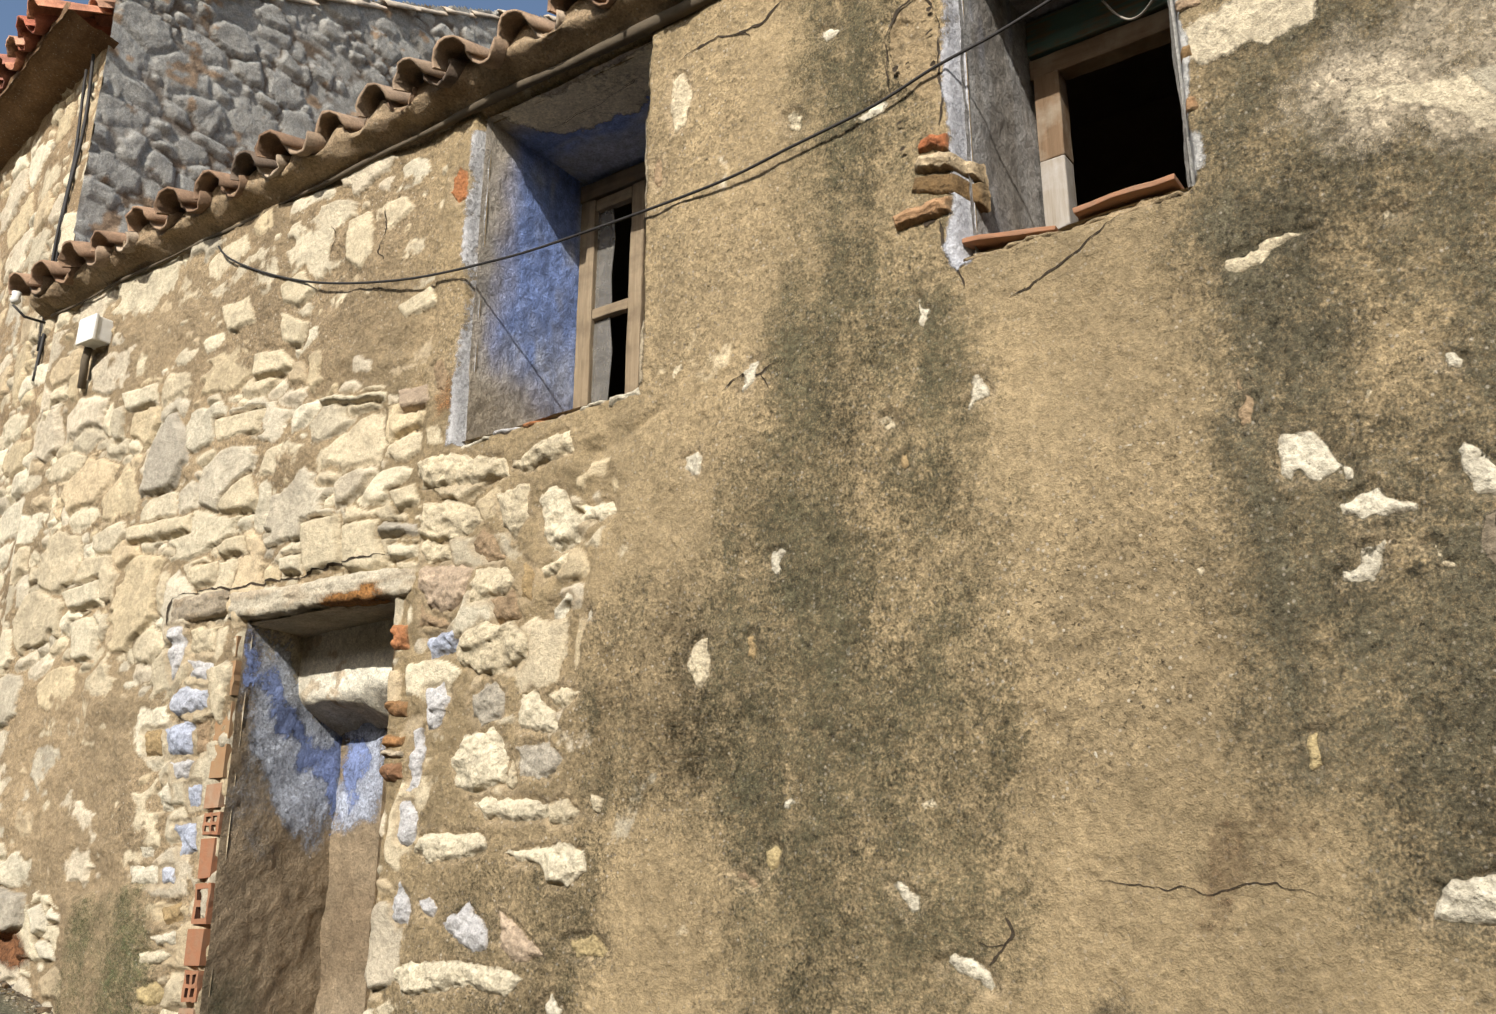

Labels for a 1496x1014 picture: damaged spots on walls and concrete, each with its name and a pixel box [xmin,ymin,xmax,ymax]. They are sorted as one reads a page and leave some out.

crack [555,0,782,127]
flaking render [892,0,991,270]
peeling [1170,0,1316,186]
crack [1009,217,1115,298]
crack [166,553,389,626]
spalling [397,130,617,888]
water stain [447,0,1044,1014]
water stain [1156,0,1496,972]
spalling [1277,430,1418,520]
peeling [238,627,387,848]
spalling [392,881,543,997]
spalling [1434,873,1496,926]